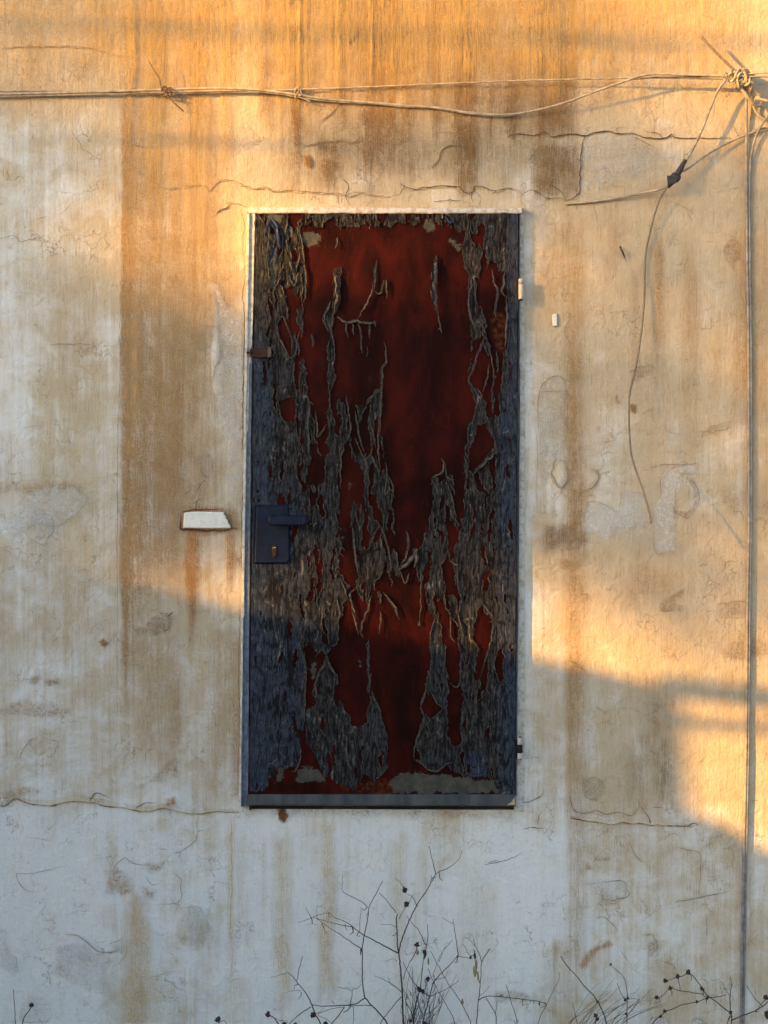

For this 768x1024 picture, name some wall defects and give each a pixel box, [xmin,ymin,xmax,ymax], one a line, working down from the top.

crack [54,294,121,640]
crack [0,470,243,983]
peeling [211,208,532,794]
water stain [87,0,720,667]
crack [126,84,753,446]